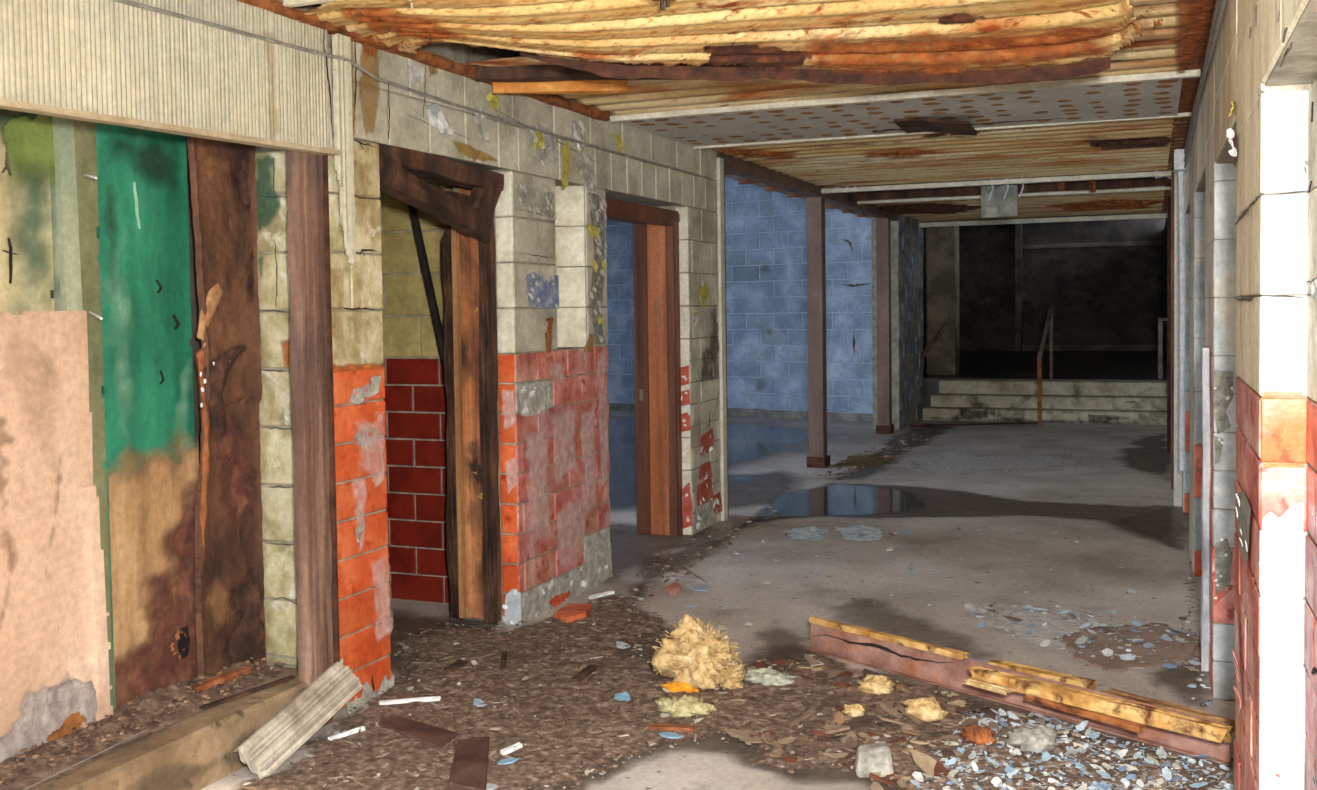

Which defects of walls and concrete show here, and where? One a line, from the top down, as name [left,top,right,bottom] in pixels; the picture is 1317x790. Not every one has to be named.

corrosion [342,7,458,60]
corrosion [704,13,1113,74]
crack [1,152,12,176]
crack [1235,277,1317,302]
spalling [350,376,381,405]
spalling [518,383,551,417]
flaking render [681,366,723,533]
spalling [356,522,364,543]
flaking render [1213,491,1283,605]
spalling [502,542,612,625]